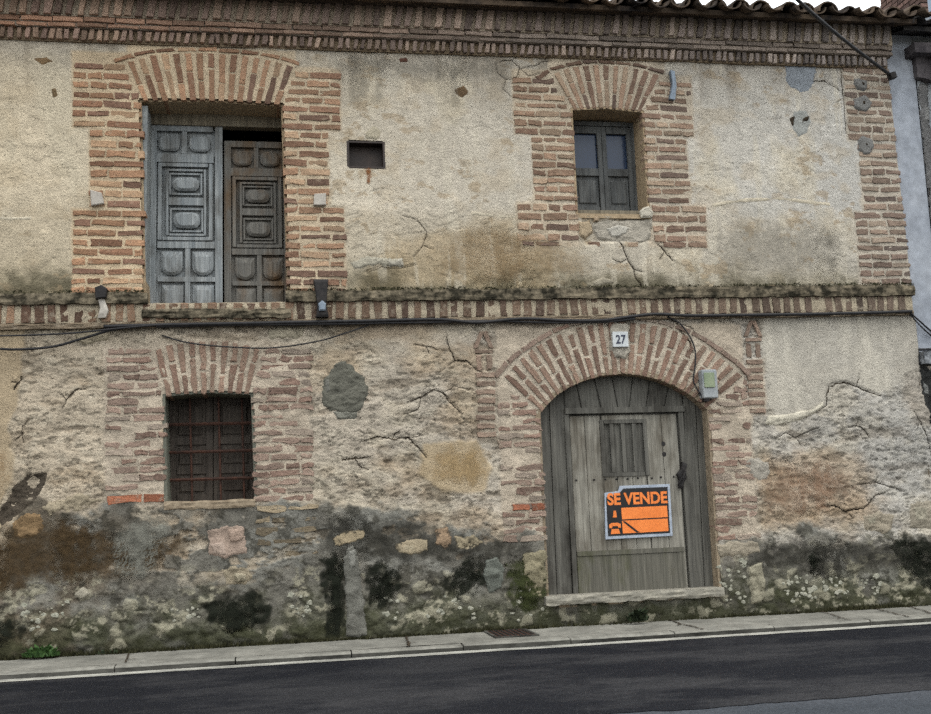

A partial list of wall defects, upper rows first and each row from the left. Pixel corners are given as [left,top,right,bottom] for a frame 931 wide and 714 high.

crack [342,336,482,470]
flaking render [766,401,824,426]
crack [821,479,904,518]
flaking render [909,501,931,529]
damp [0,521,180,592]
damp [320,520,549,638]
damp [754,533,931,588]
mould [0,619,26,641]
mould [202,590,273,633]